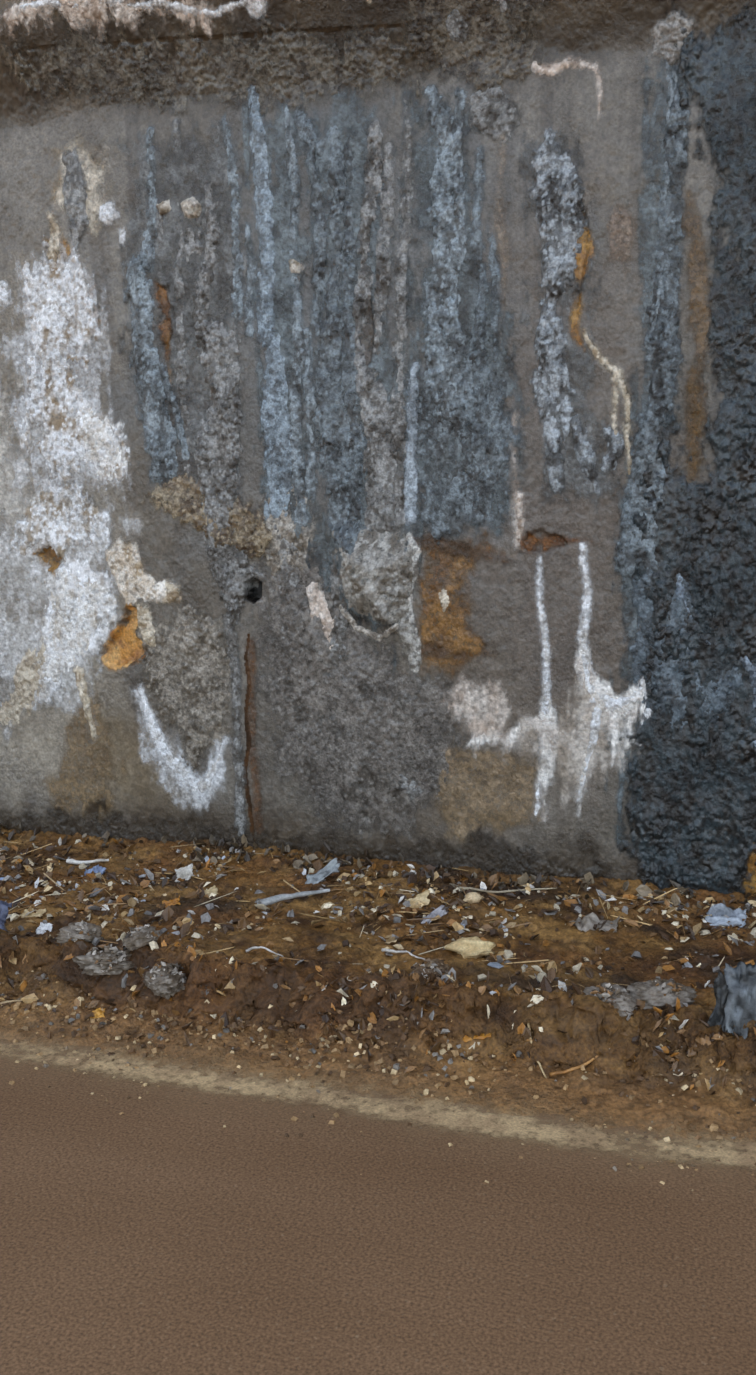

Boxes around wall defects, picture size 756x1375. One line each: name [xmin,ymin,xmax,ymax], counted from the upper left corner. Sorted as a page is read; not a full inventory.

water stain [0,0,756,895]
spalling [101,601,156,670]
crack [223,616,262,840]
corrosion [415,533,507,674]